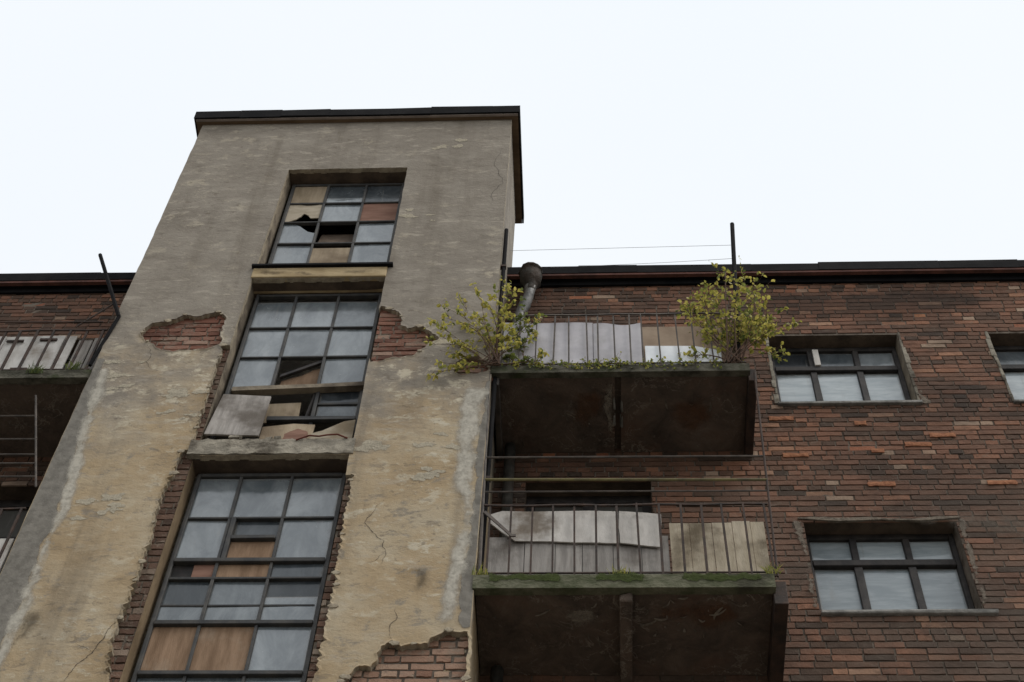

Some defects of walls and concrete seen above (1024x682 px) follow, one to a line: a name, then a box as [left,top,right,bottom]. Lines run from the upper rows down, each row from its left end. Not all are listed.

flaking render [139,310,228,358]
flaking render [371,305,441,362]
damp [439,381,490,628]
flaking render [337,627,472,682]